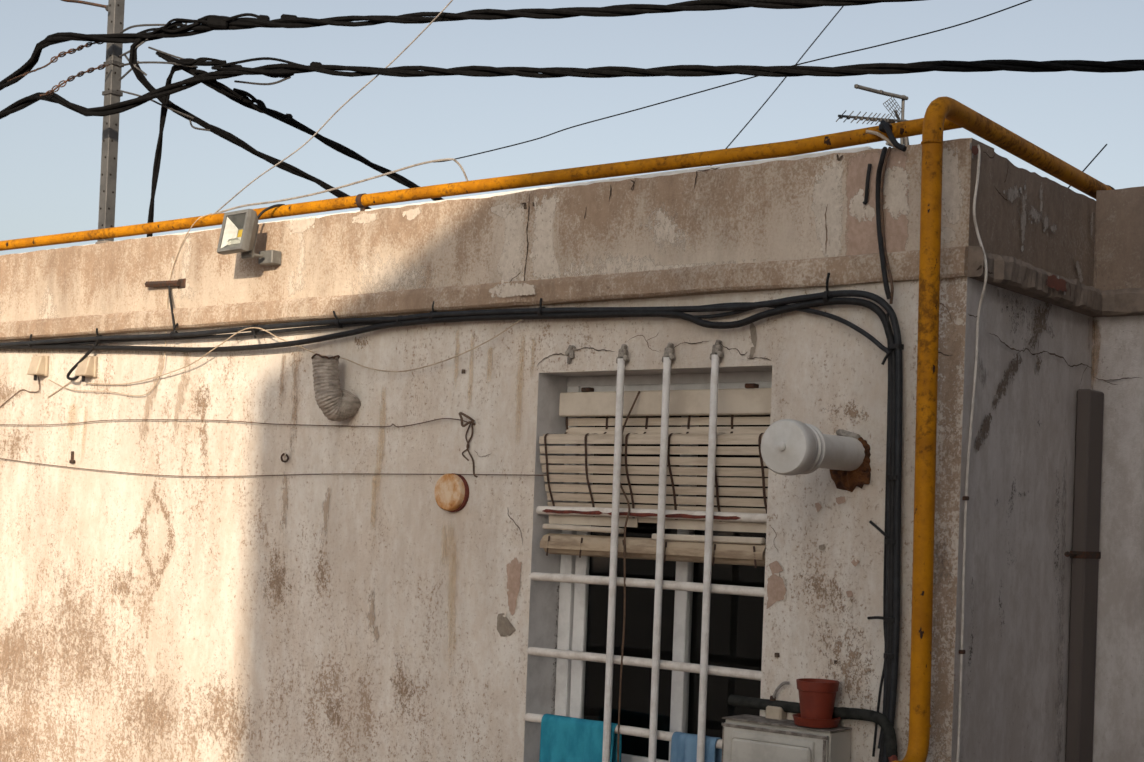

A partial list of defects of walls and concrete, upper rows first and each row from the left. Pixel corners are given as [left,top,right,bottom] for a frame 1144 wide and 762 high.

crack [510,194,530,282]
peeling [1003,180,1057,258]
spalling [488,279,536,298]
crack [939,302,1139,385]
spalling [497,557,522,637]
peeling [767,561,787,609]
peeling [799,564,880,734]